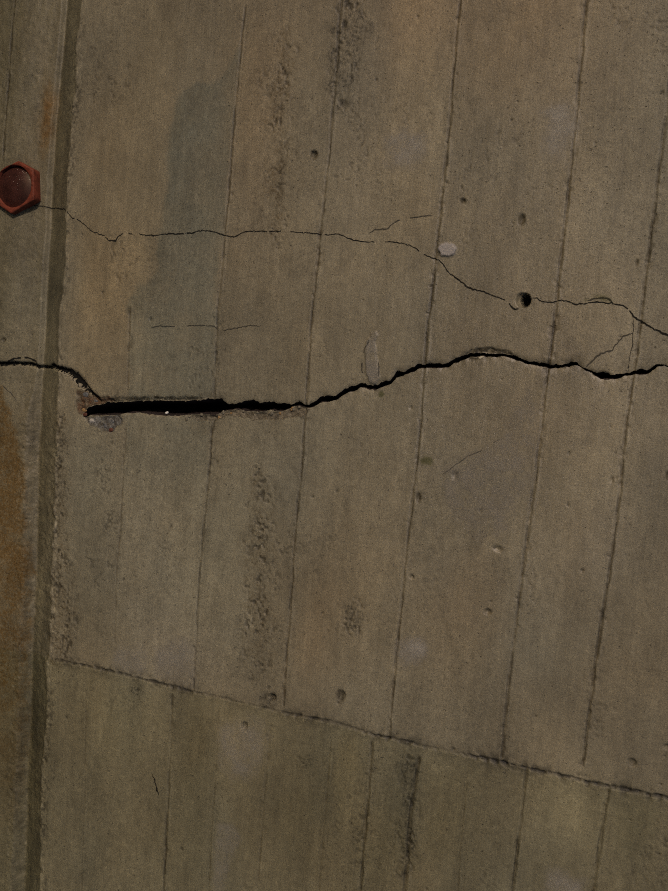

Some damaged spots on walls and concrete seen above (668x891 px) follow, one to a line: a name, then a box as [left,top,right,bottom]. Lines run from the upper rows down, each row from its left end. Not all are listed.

spalling [76,390,122,432]
crack [0,205,668,421]